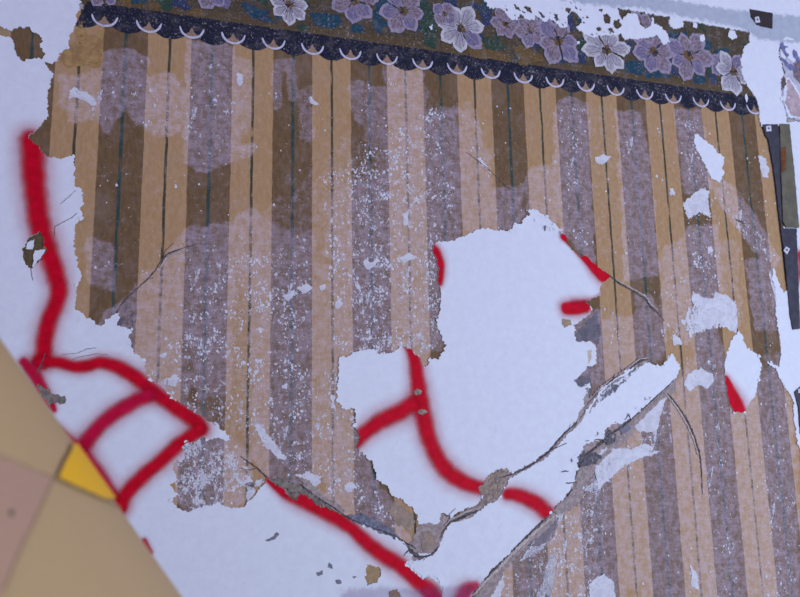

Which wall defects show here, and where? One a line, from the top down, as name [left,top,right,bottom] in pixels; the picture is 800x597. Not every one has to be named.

peeling [0,0,140,440]
peeling [39,147,173,399]
crack [116,245,193,313]
peeling [90,209,680,597]
crack [301,484,479,559]
crack [499,357,647,478]
crack [472,378,703,596]
crack [606,272,664,320]
peeling [483,0,800,252]
peeling [724,266,800,459]